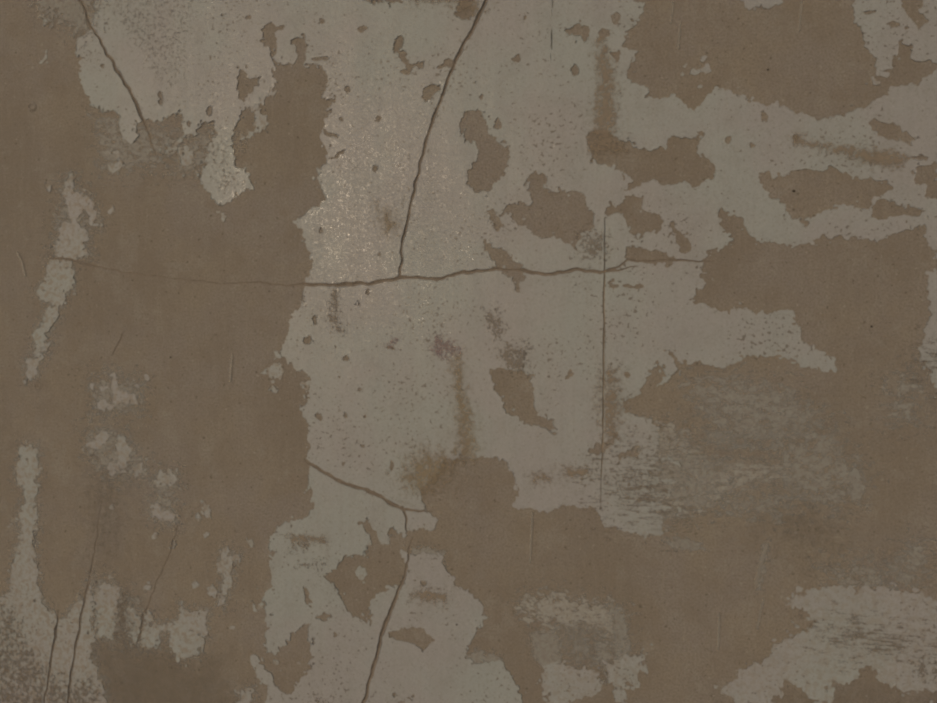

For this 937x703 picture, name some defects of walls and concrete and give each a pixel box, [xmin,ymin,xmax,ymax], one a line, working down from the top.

peeling [393,36,423,75]
peeling [421,85,440,102]
peeling [459,94,510,193]
peeling [565,0,937,122]
peeling [869,118,919,146]
crack [49,0,714,503]
peeling [0,0,350,703]
peeling [290,131,937,703]
crack [304,459,432,703]